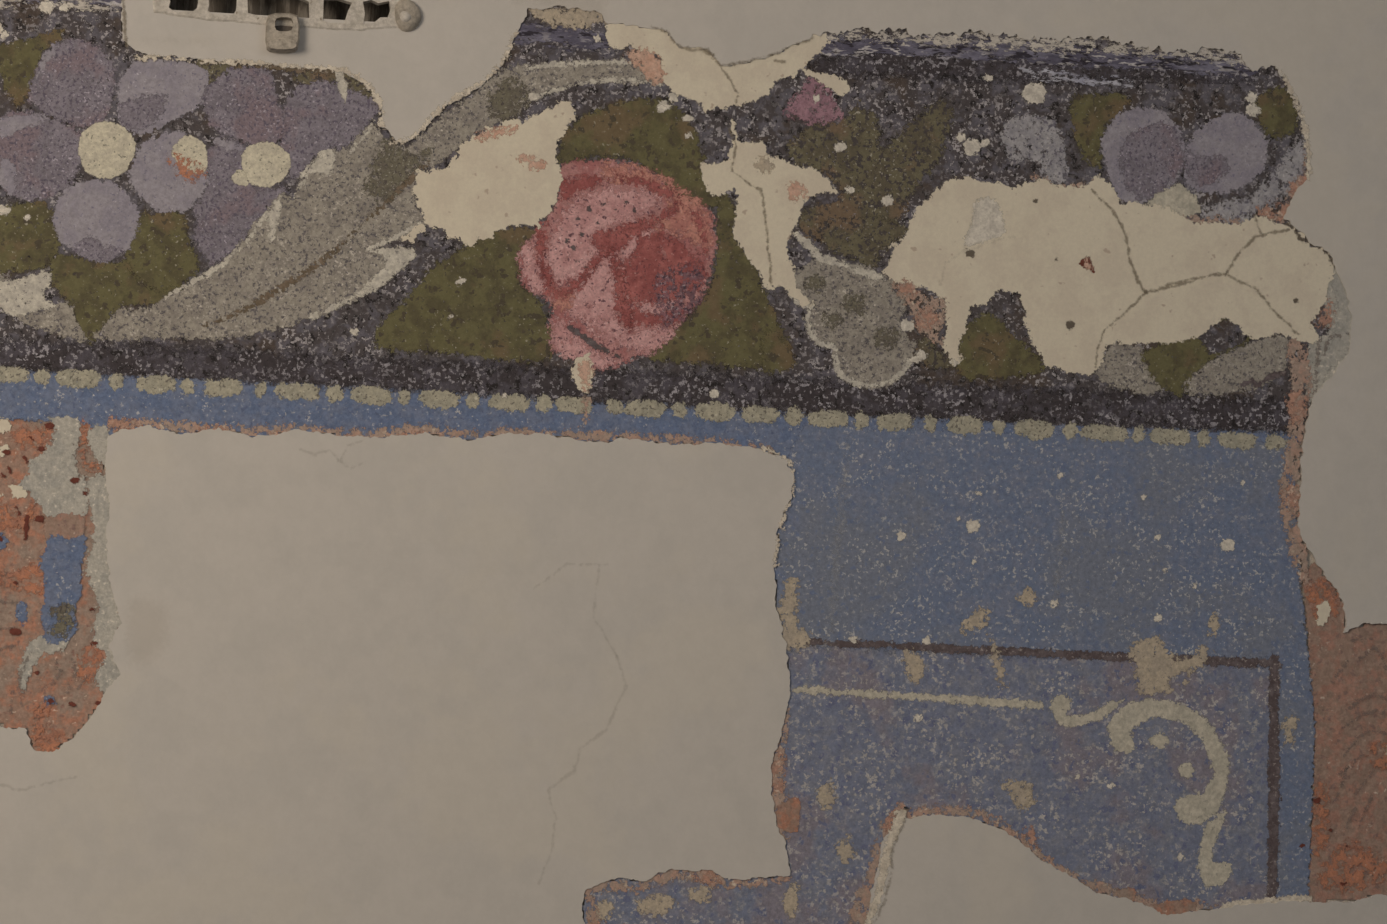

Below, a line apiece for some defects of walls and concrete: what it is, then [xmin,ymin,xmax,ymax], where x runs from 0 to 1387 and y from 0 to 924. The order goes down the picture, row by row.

crack [1092,189,1335,349]